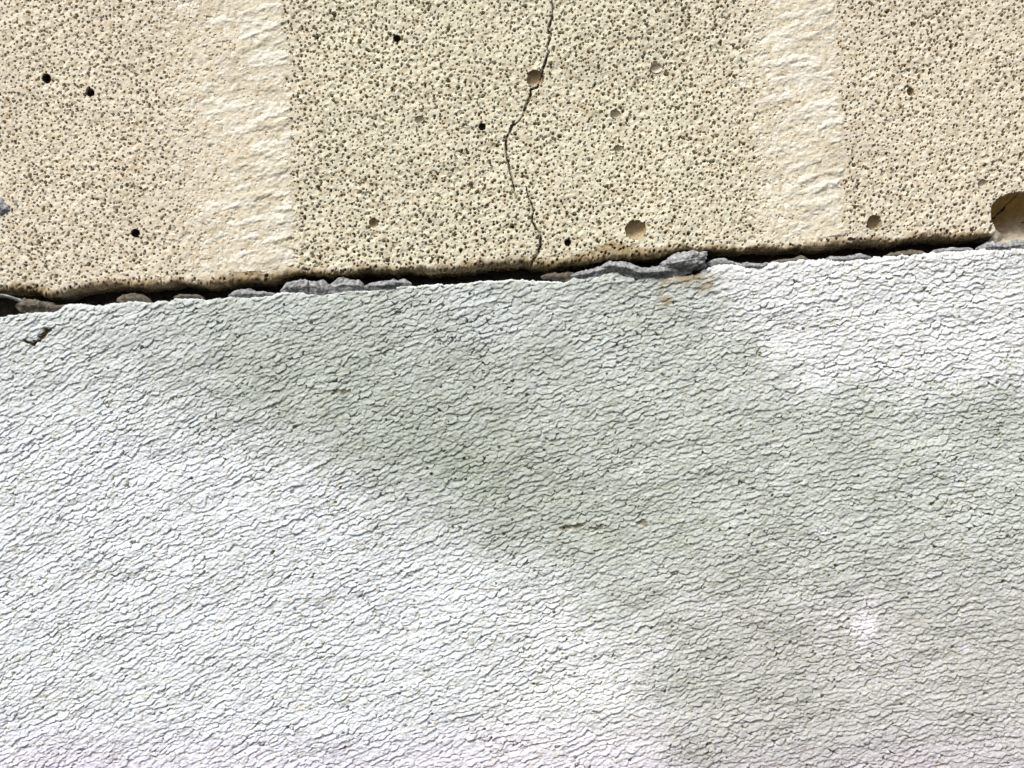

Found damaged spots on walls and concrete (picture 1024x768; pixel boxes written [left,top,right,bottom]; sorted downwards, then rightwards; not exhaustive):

crack [505,0,553,269]